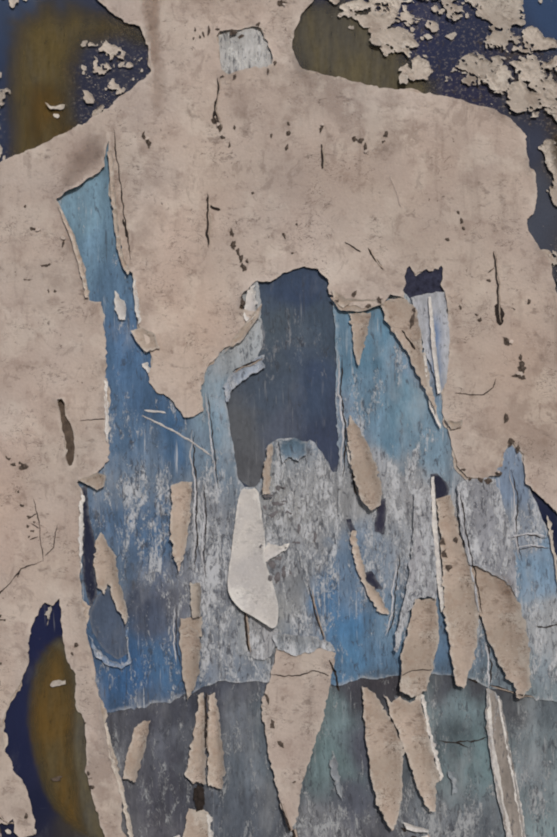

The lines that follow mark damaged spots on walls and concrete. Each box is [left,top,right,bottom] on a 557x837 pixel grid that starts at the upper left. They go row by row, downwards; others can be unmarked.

leakage [10,7,143,155]
peeling [81,40,142,78]
leakage [292,3,430,94]
peeling [330,0,439,84]
peeling [431,0,557,121]
peeling [538,139,557,206]
peeling [347,415,386,534]
crack [0,499,57,593]
leakage [30,639,105,837]
peeling [123,720,151,782]
peeling [175,582,226,837]
peeling [228,488,336,831]